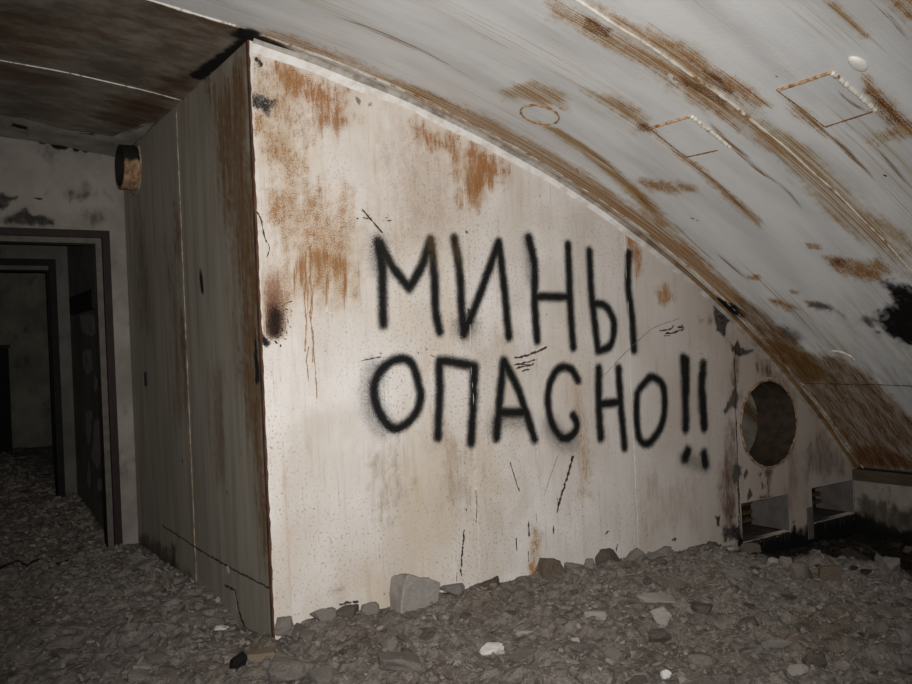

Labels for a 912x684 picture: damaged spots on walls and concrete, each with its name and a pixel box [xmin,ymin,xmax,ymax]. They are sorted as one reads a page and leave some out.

corrosion [259,0,912,472]
peeling [729,340,753,356]
peeling [724,389,739,413]
corrosion [721,423,736,527]
crack [162,525,271,626]